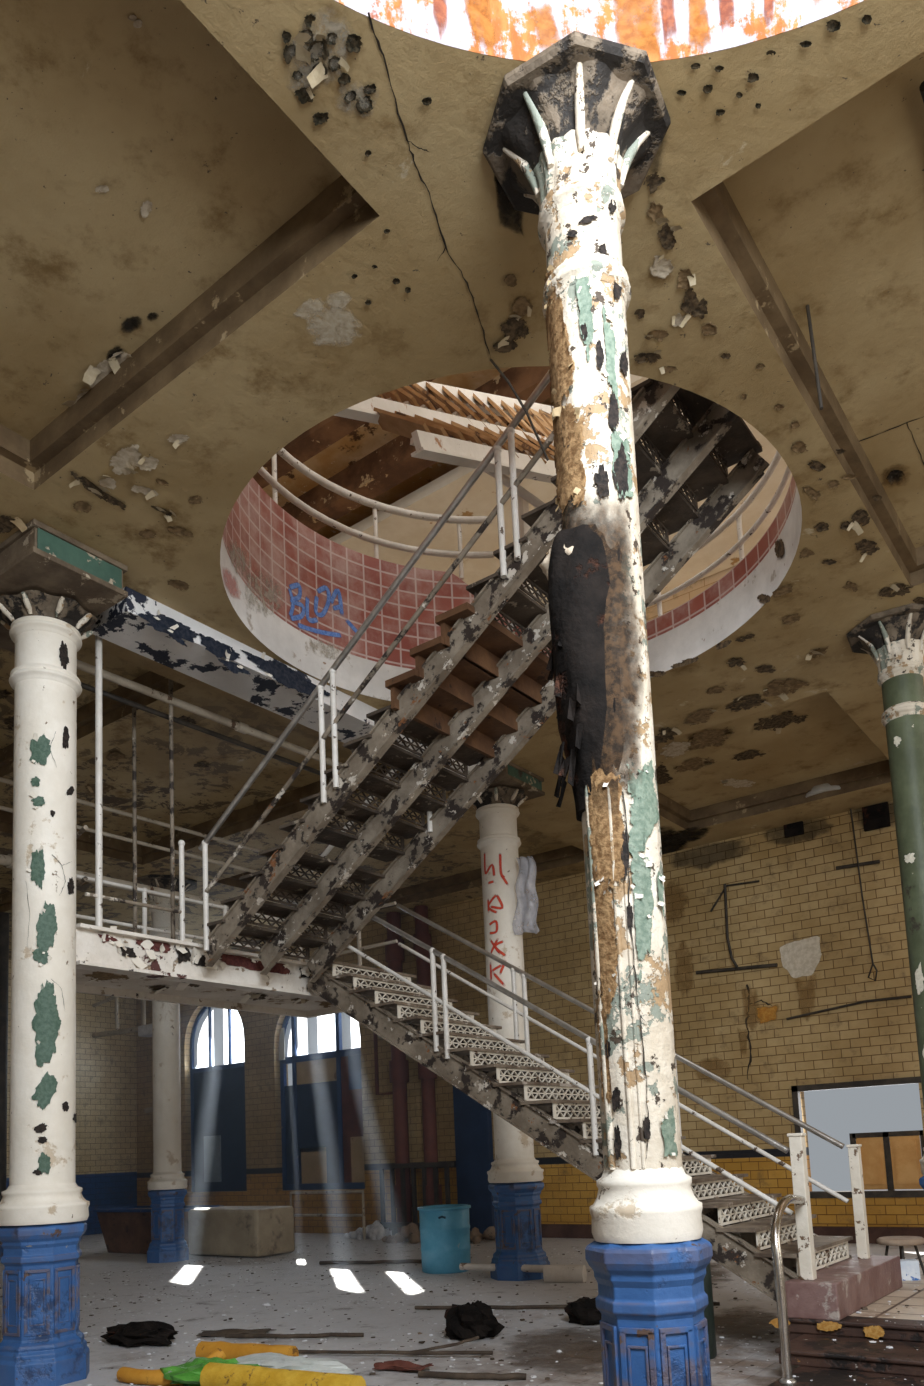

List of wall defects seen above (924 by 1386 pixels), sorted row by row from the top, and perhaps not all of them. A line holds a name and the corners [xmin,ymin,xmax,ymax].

spalling [282,14,377,125]
crack [368,12,491,358]
peeling [61,313,158,407]
peeling [493,172,717,513]
peeling [59,641,69,670]
peeling [138,609,330,698]
peeling [29,726,70,817]
peeling [66,782,115,797]
peeling [587,634,810,1160]
peeling [27,845,77,1175]
peeling [780,936,822,978]
peeling [915,962,924,995]